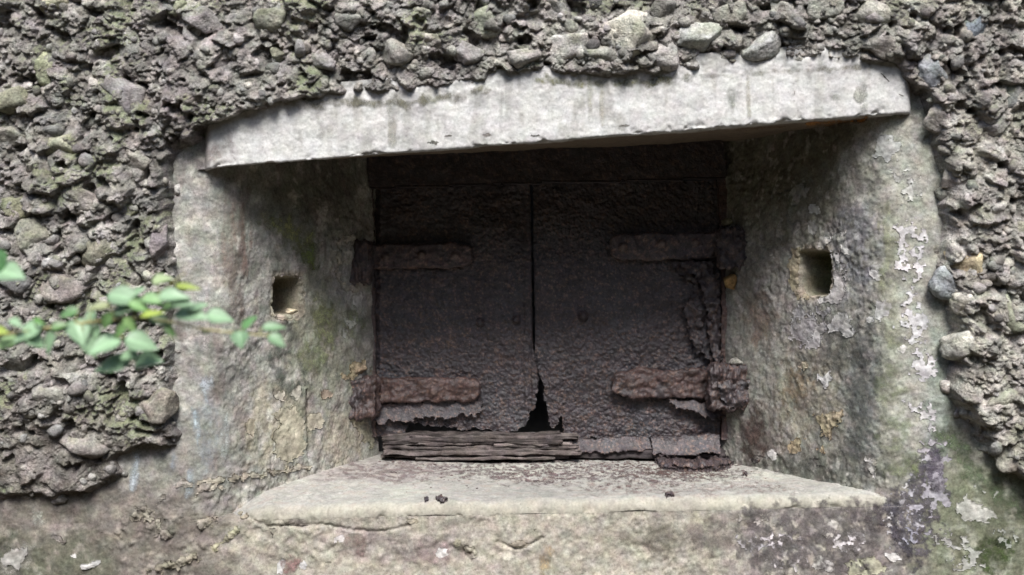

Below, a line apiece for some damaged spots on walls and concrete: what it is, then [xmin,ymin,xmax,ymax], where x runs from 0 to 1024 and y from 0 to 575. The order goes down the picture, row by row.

peeling [787,134,938,389]
peeling [271,385,324,463]